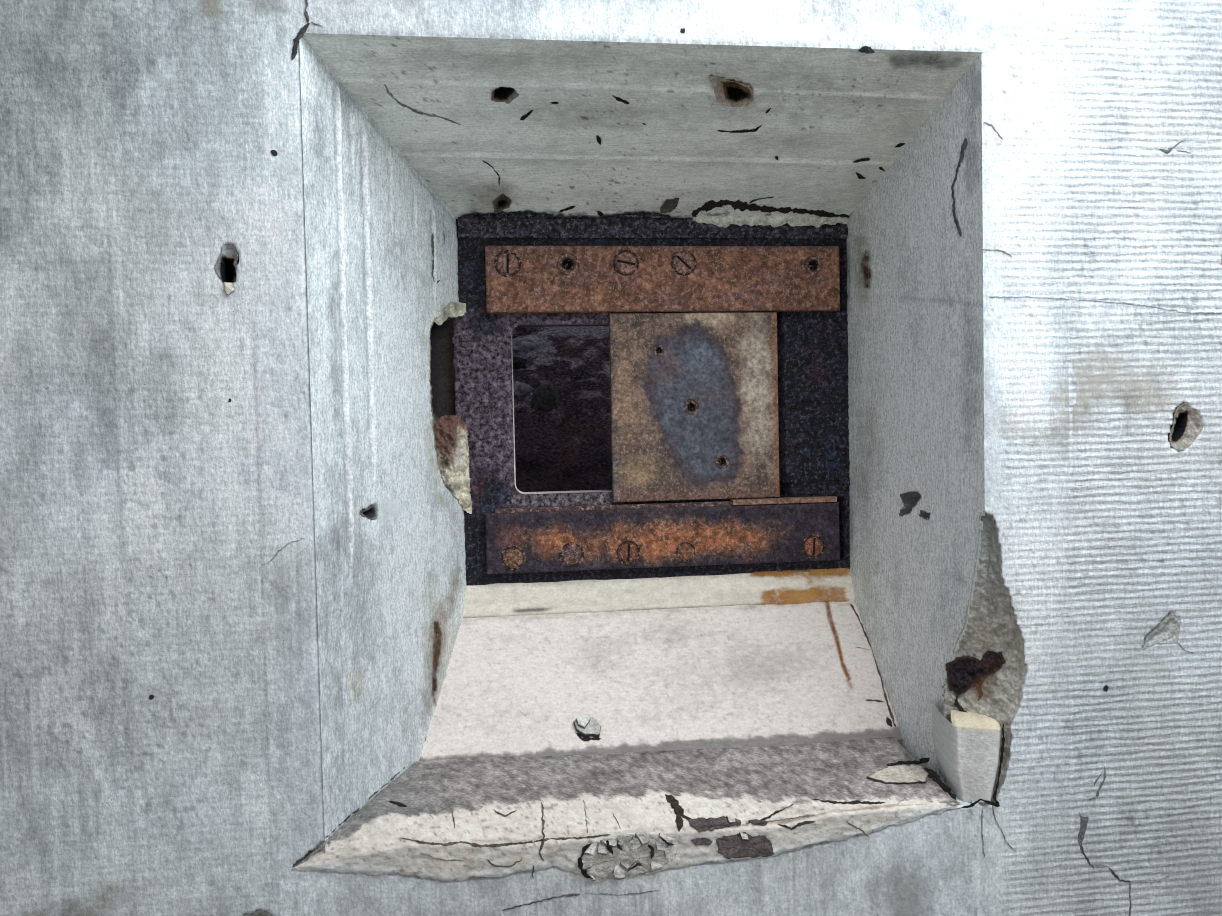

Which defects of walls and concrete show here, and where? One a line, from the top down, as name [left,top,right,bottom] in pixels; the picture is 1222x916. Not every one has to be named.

crack [292,0,323,60]
spalling [429,301,472,514]
corrosion [753,568,852,688]
spalling [867,511,1027,808]
spalling [578,816,774,883]
crack [1078,766,1170,916]